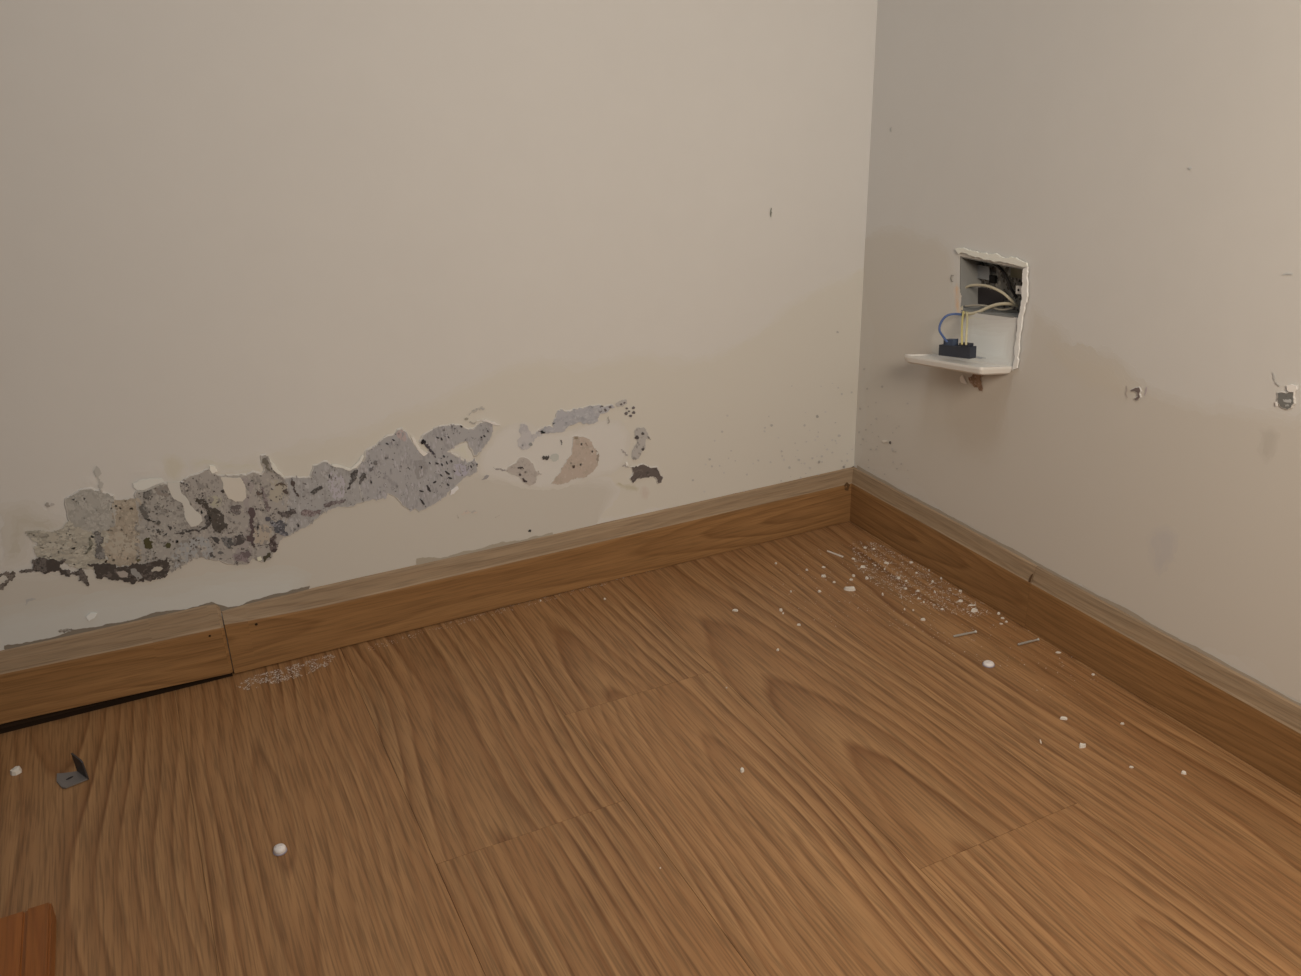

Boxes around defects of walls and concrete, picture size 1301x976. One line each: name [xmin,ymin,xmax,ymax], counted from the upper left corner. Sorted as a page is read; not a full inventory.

flaking render [955,248,1029,391]
spalling [1275,384,1297,410]
peeling [25,399,663,573]